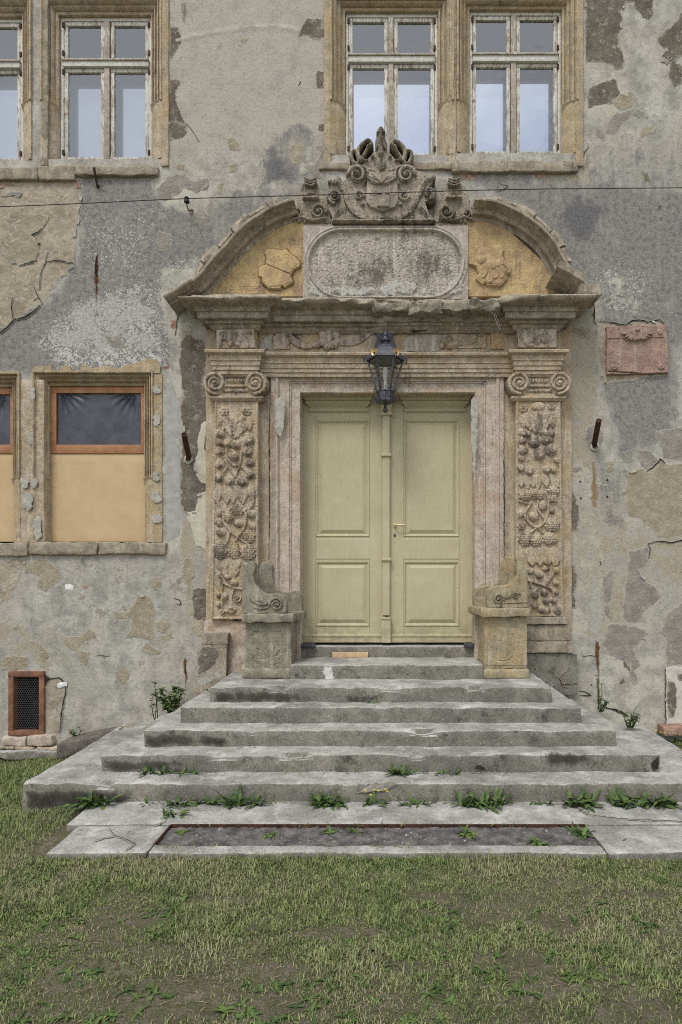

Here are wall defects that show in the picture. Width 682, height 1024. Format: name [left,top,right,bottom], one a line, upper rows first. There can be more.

flaking render [584,0,655,141]
flaking render [657,11,682,88]
crack [0,228,73,334]
flaking render [0,178,82,329]
flaking render [164,320,206,542]
flaking render [606,426,682,538]
crack [648,539,682,559]
flaking render [107,577,173,655]
flaking render [601,547,682,724]